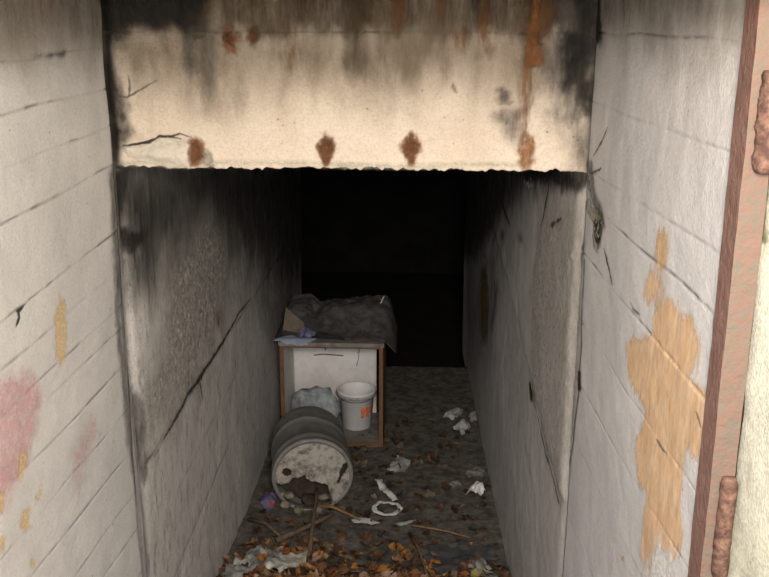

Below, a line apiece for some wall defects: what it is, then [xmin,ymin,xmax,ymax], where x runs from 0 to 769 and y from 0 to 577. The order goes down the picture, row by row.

water stain [131,27,237,88]
corrosion [522,0,553,116]
crack [123,133,186,146]
corrosion [188,139,204,165]
corrosion [316,135,335,166]
corrosion [401,132,421,166]
corrosion [518,127,534,169]
crack [154,299,250,456]
peeling [626,230,706,577]